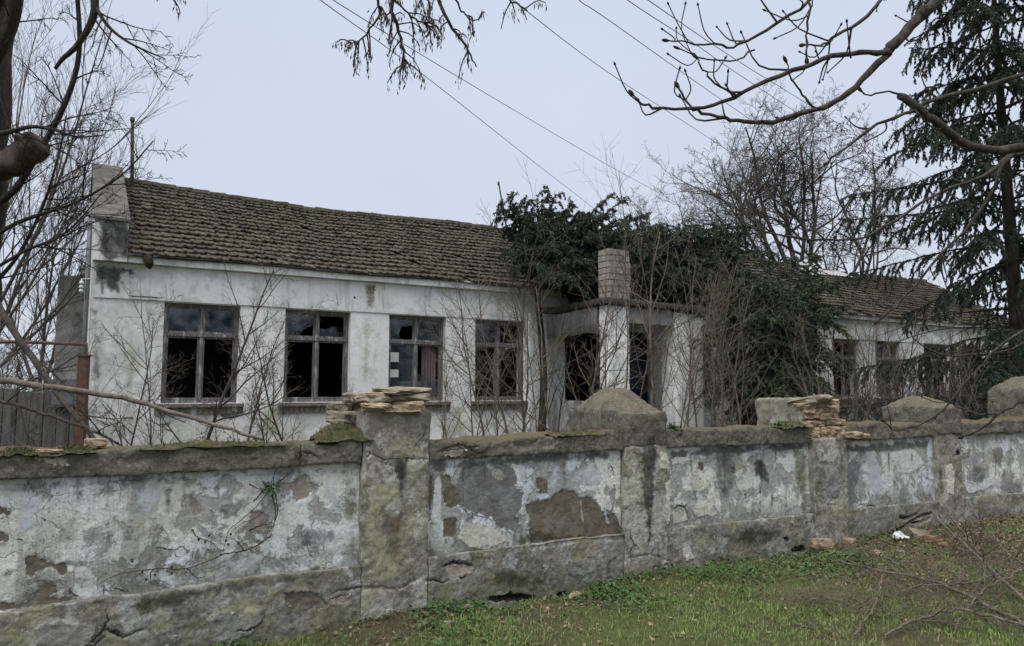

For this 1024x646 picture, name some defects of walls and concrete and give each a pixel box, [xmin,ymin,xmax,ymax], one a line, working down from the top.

spalling [280,473,317,502]
peeling [428,464,621,543]
peeling [840,459,861,504]
peeling [0,555,77,611]
crack [89,583,143,646]
spalling [285,591,354,609]